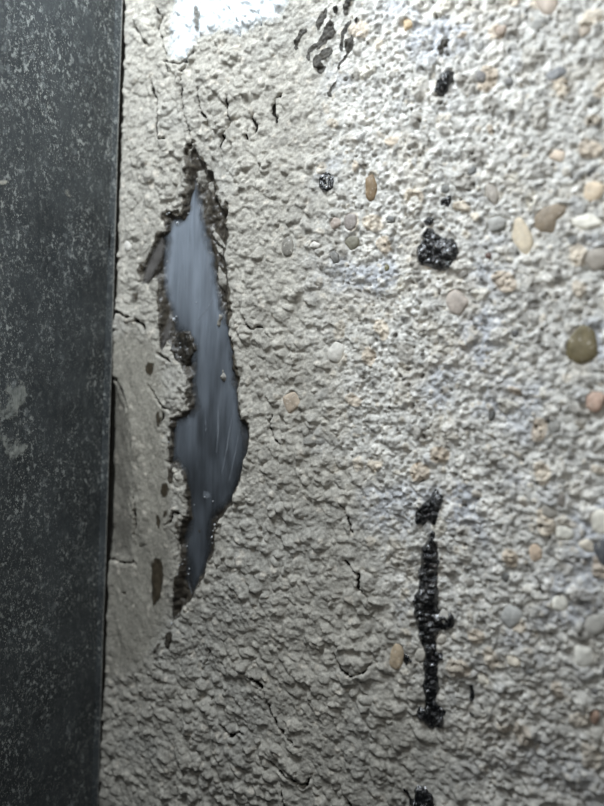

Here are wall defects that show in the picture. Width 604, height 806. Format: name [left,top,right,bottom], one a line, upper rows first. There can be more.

crack [151,53,207,144]
crack [246,95,282,140]
spalling [137,142,249,621]
crack [345,560,363,592]
crack [250,678,293,743]
crack [270,761,310,806]